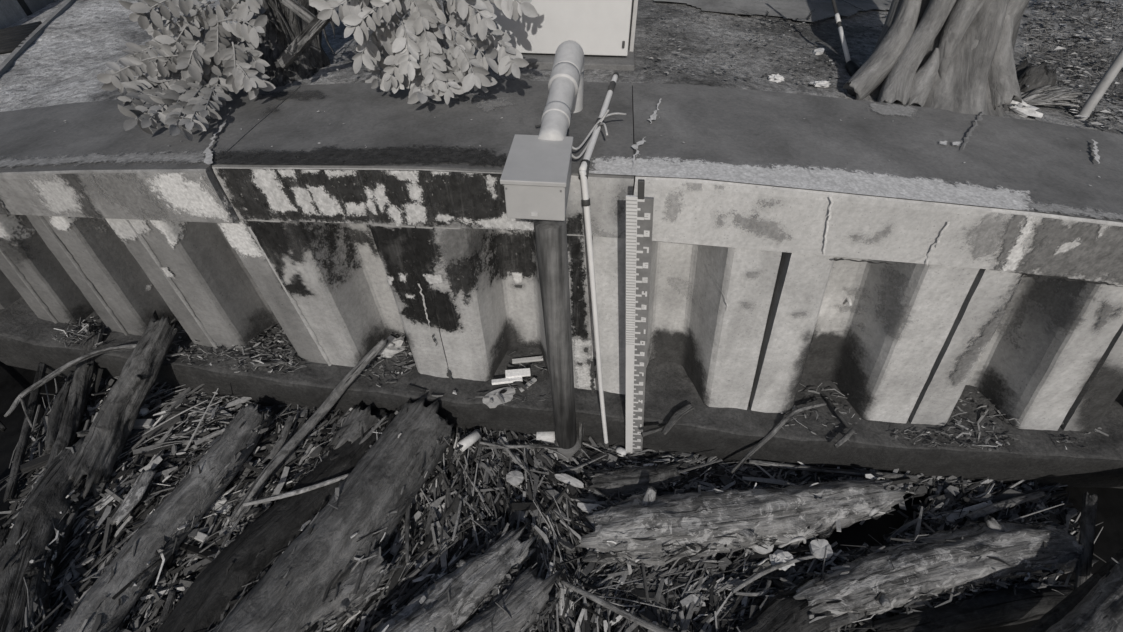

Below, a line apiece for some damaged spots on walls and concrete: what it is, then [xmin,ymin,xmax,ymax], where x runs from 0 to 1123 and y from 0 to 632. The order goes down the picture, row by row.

damp [57,173,166,220]
crack [203,123,225,164]
damp [214,142,539,363]
damp [784,268,911,421]
damp [951,212,1123,434]